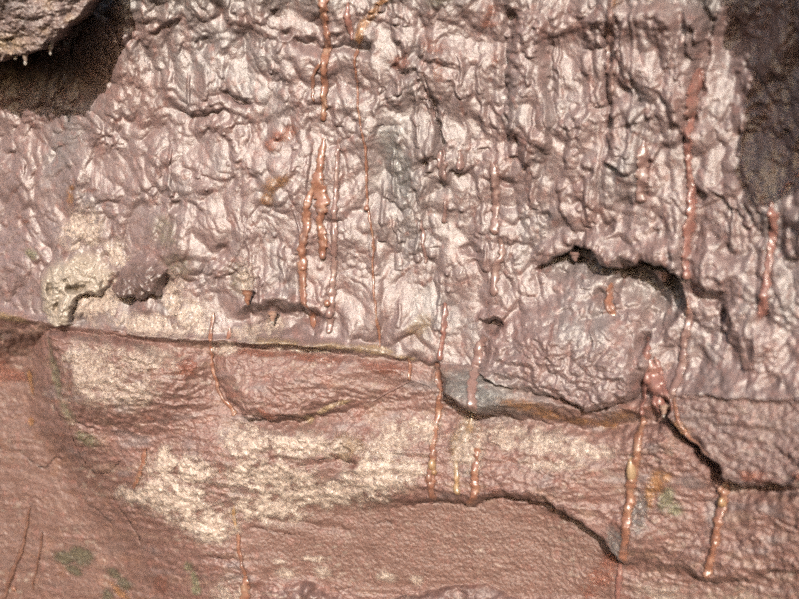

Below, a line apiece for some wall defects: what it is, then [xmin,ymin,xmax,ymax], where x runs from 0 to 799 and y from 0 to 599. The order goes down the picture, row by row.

corrosion [310,0,333,121]
corrosion [343,0,388,44]
corrosion [296,138,340,334]
corrosion [489,162,506,296]
corrosion [681,68,704,280]
corrosion [756,201,779,319]
efflorescence [115,417,439,545]
corrosion [425,302,449,501]
corrosion [451,335,487,507]
corrosion [584,299,709,599]
corrosion [702,463,731,580]